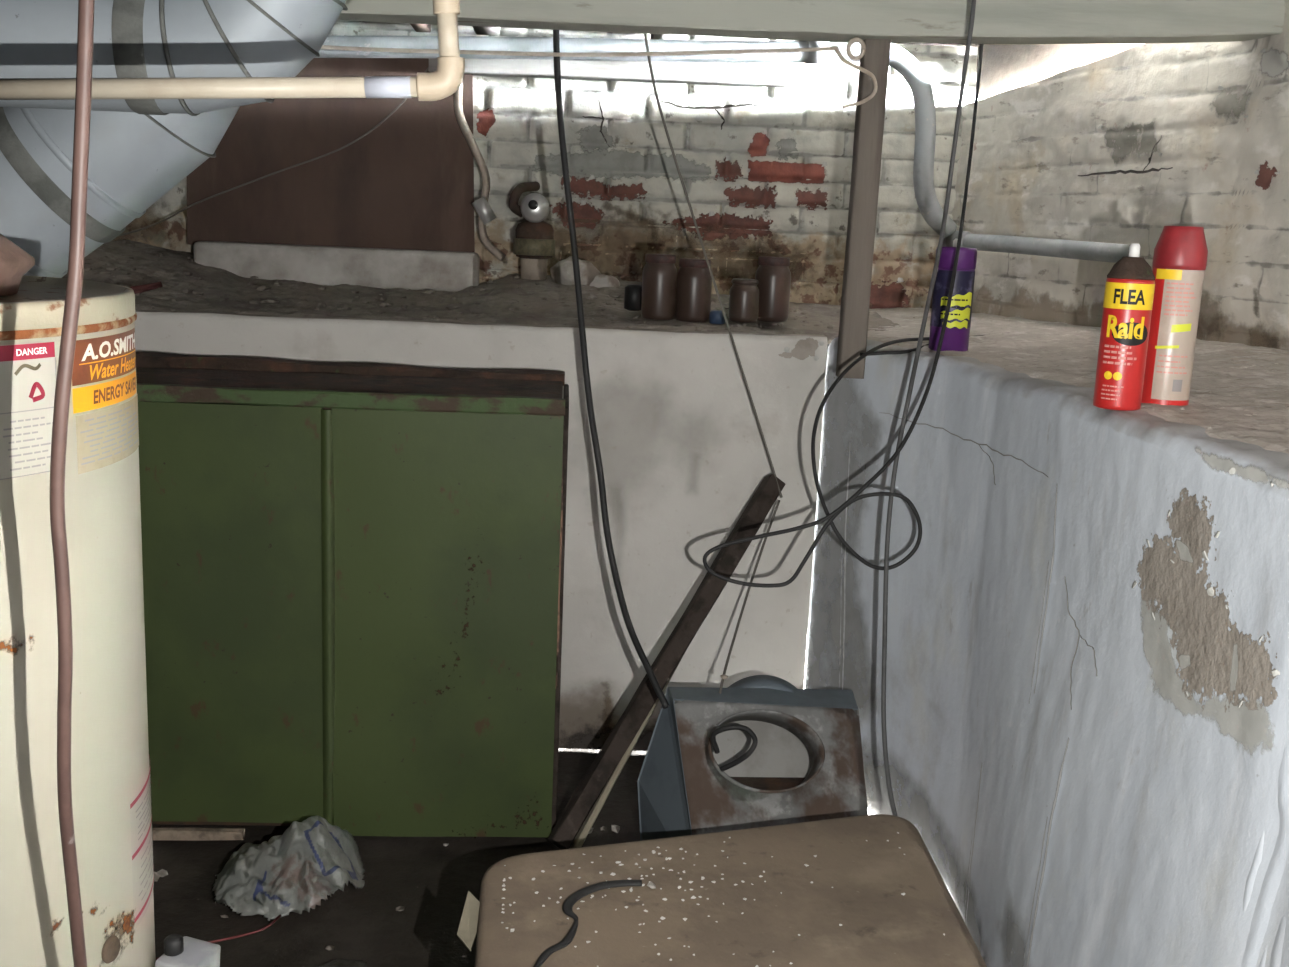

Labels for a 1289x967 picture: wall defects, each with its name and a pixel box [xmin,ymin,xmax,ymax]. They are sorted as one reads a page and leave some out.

flaking render [549,175,647,229]
flaking render [662,129,829,241]
flaking render [1254,161,1280,190]
leakage [548,203,805,280]
spalling [1196,448,1289,488]
peeling [1132,488,1280,754]